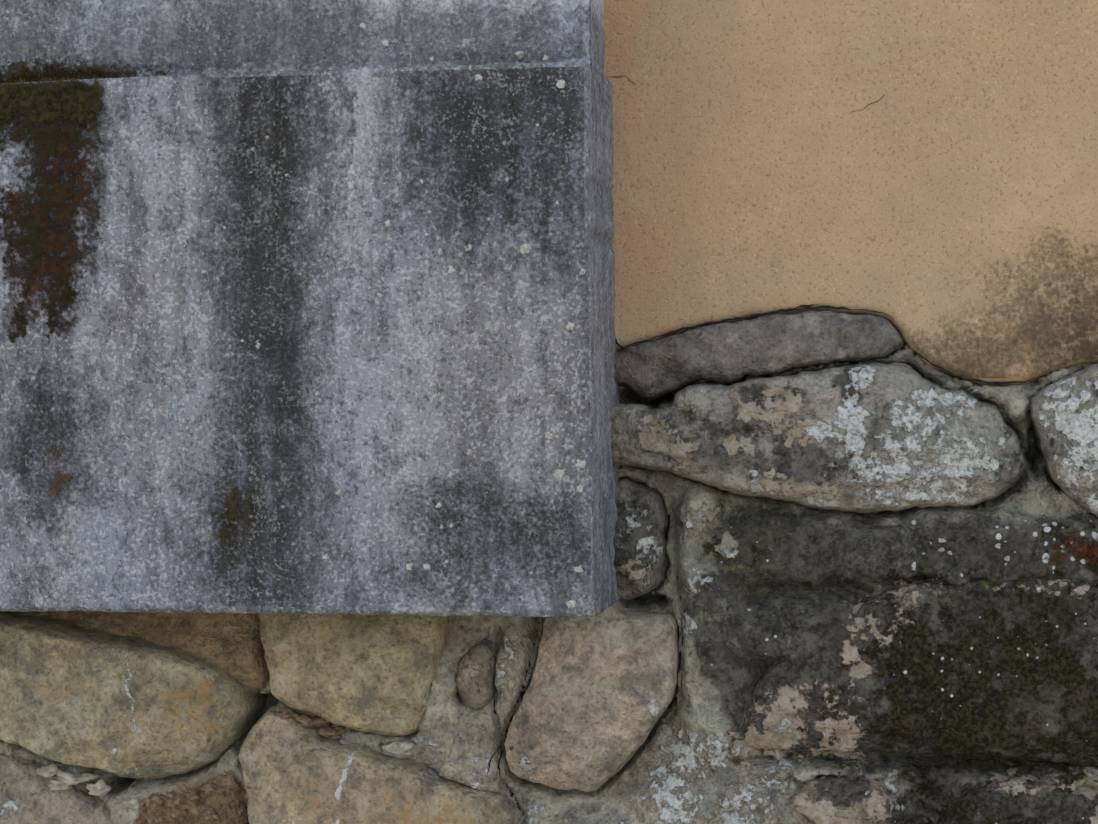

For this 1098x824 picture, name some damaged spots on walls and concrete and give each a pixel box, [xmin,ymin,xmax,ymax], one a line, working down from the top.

rust [0,79,111,343]
water stain [83,1,364,607]
water stain [335,79,388,291]
water stain [392,14,584,274]
water stain [5,368,105,533]
water stain [404,465,591,610]